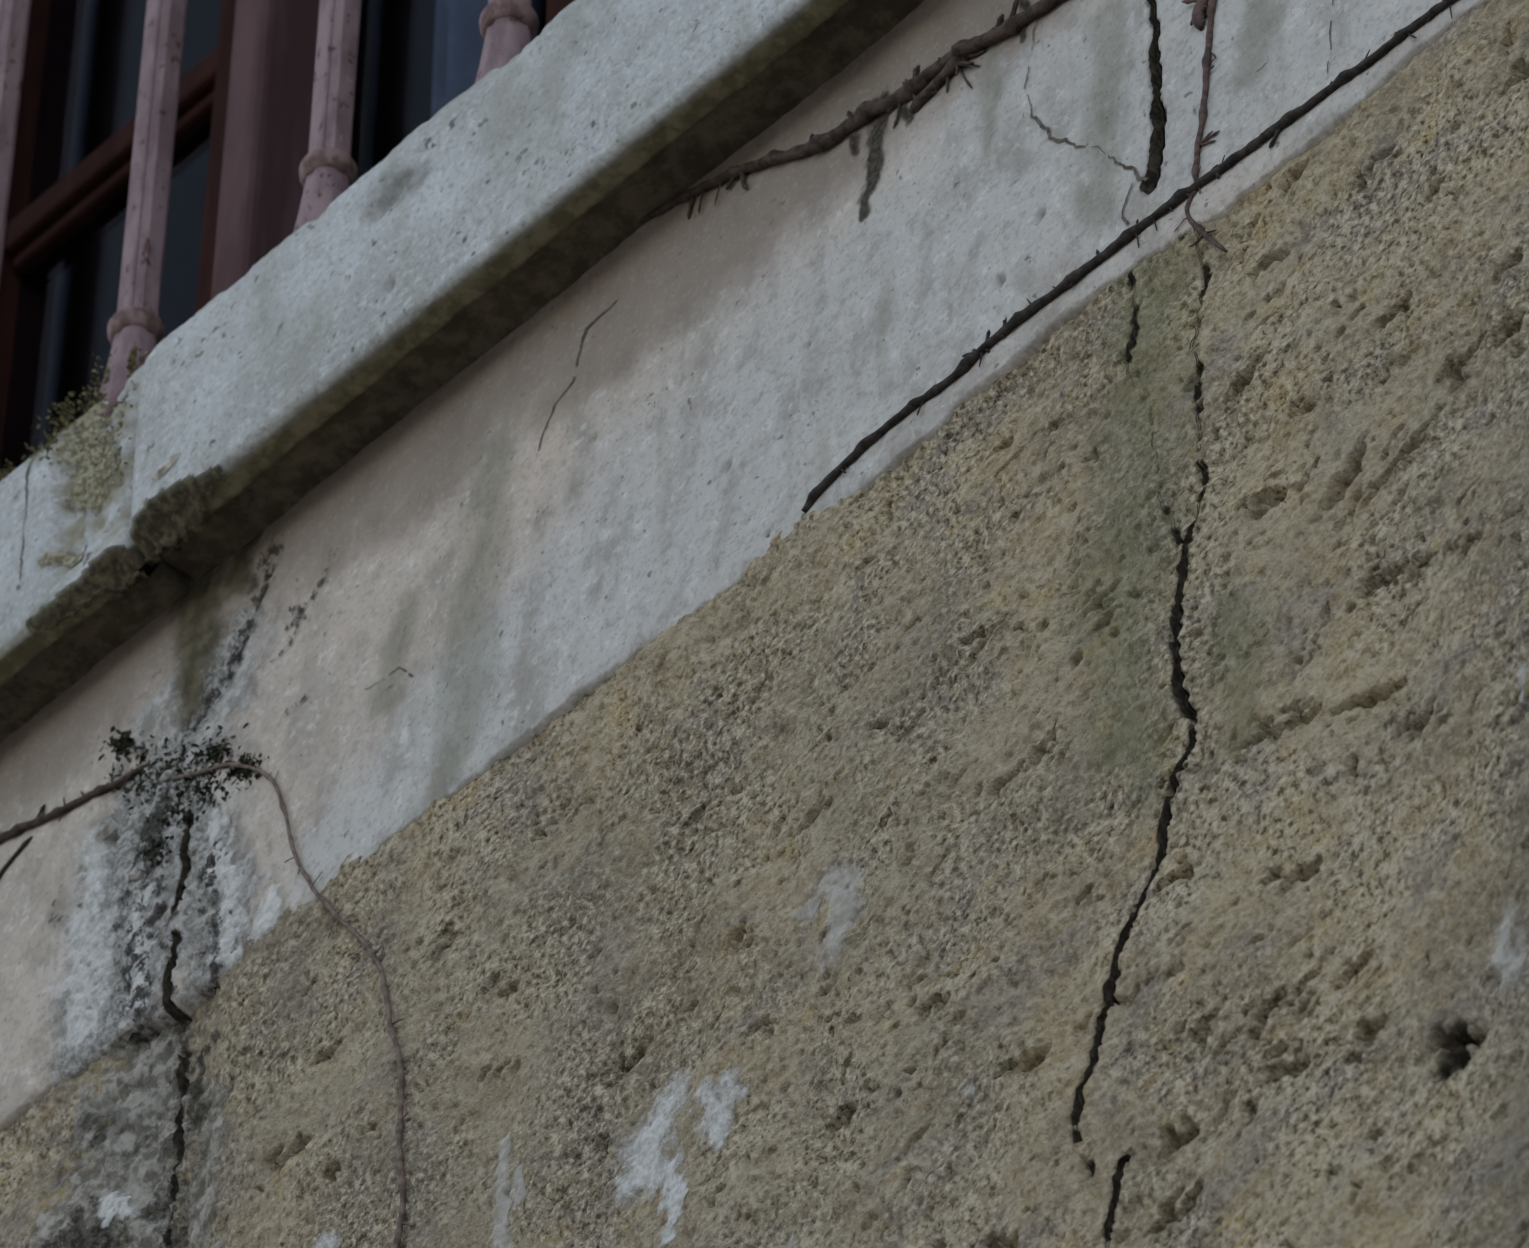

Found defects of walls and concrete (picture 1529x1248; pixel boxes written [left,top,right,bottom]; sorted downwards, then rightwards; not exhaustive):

crack [1024,0,1167,226]
crack [1071,228,1212,1248]
damp [24,808,282,1248]
crack [154,812,194,1246]
damp [616,1070,747,1244]